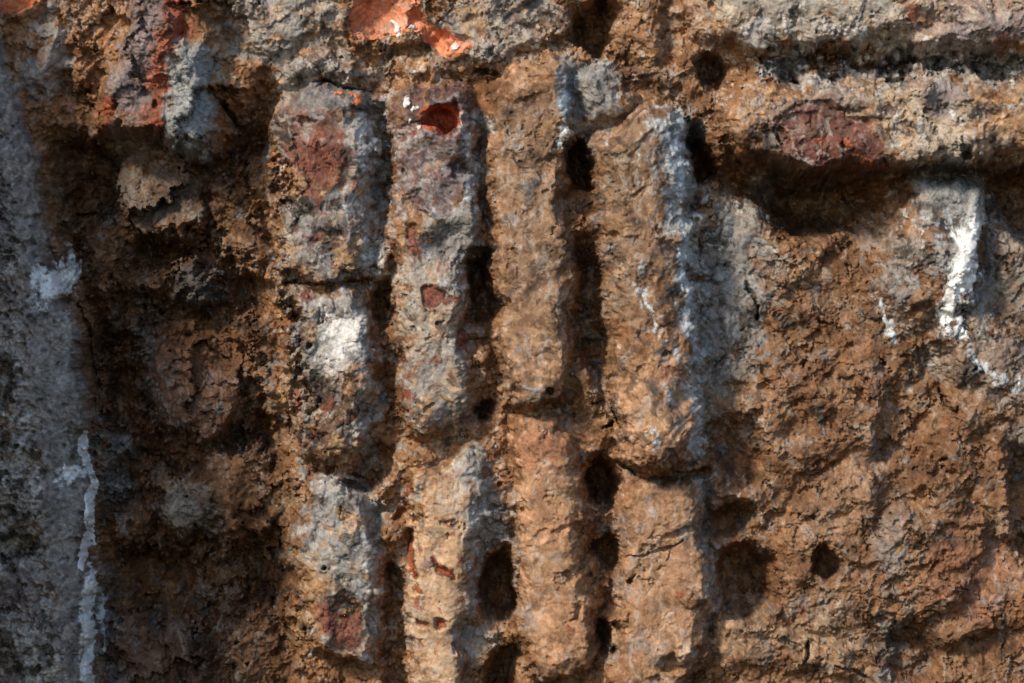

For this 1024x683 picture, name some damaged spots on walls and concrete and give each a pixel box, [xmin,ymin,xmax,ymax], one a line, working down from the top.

spalling [342,0,480,57]
spalling [413,97,463,140]